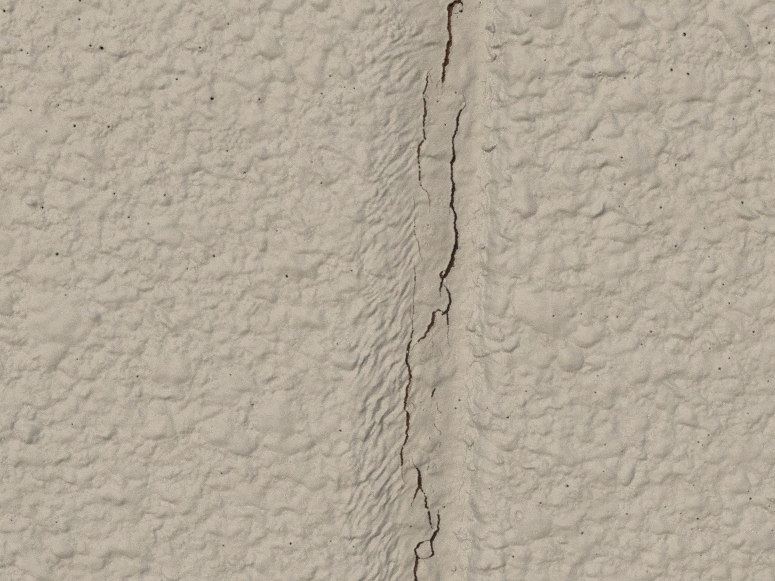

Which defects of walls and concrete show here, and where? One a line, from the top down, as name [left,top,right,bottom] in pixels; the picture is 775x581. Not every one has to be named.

crack [400,0,466,581]